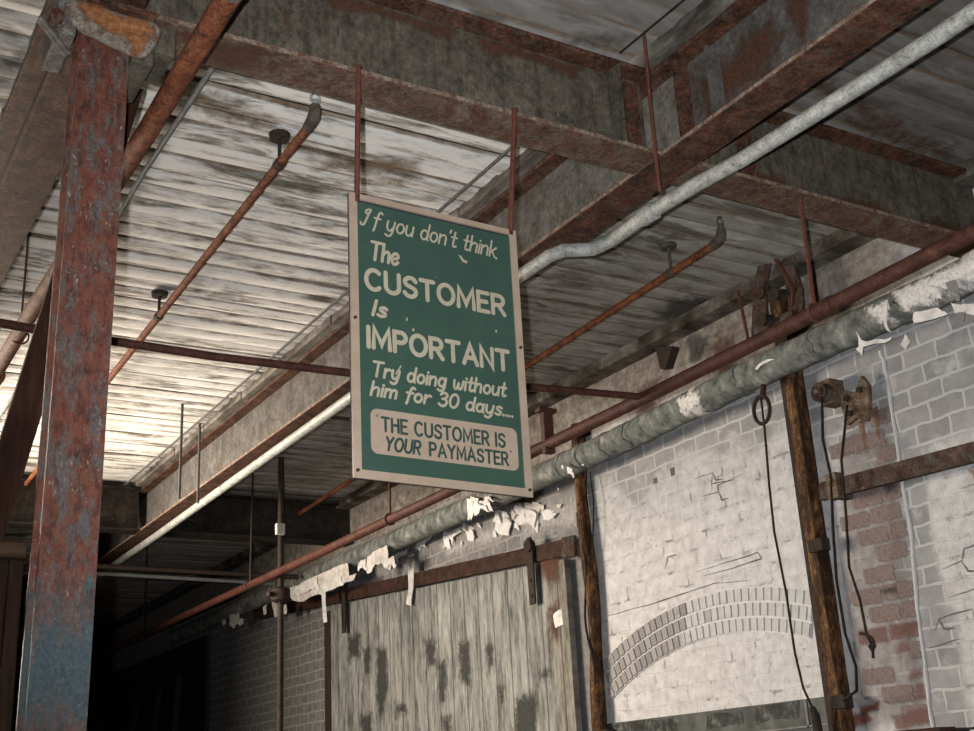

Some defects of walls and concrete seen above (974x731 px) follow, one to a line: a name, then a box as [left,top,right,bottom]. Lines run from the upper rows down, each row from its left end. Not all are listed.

corrosion [78,1,155,55]
corrosion [721,24,782,102]
peeling [871,407,892,428]
crack [694,472,742,501]
peeling [347,494,577,588]
peeling [553,609,563,628]
peeling [840,482,929,729]
crack [929,545,974,648]